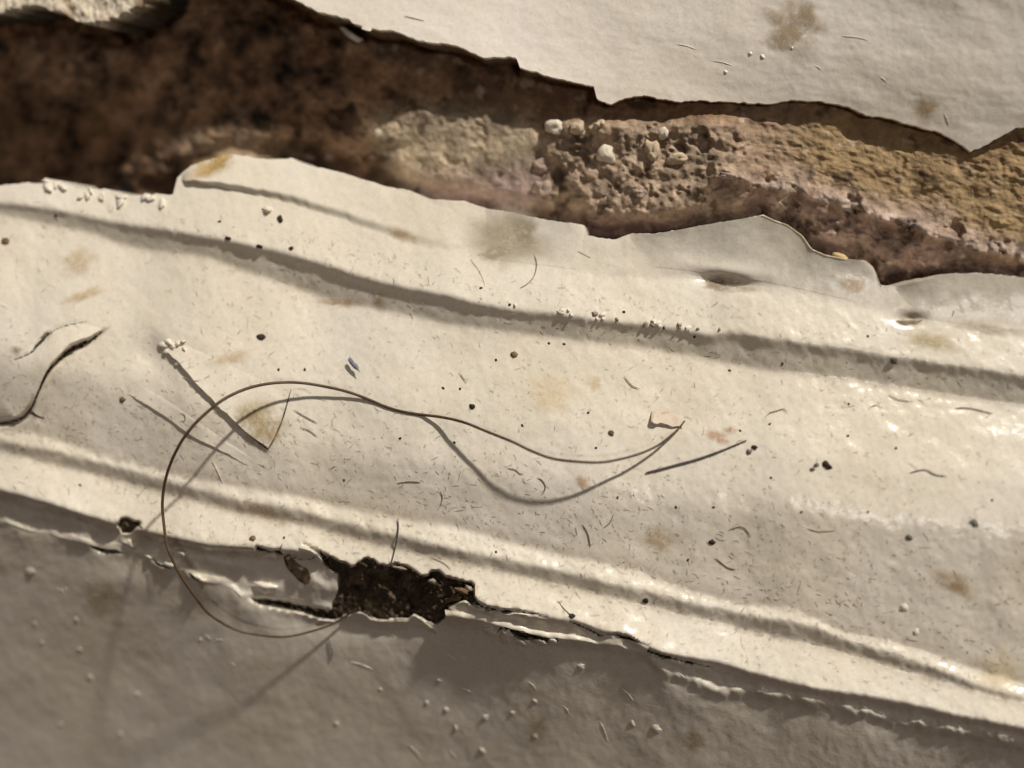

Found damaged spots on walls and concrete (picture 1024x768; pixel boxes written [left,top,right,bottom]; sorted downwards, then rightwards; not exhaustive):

spalling [0,0,1024,332]
crack [0,322,109,425]
spalling [0,515,649,654]